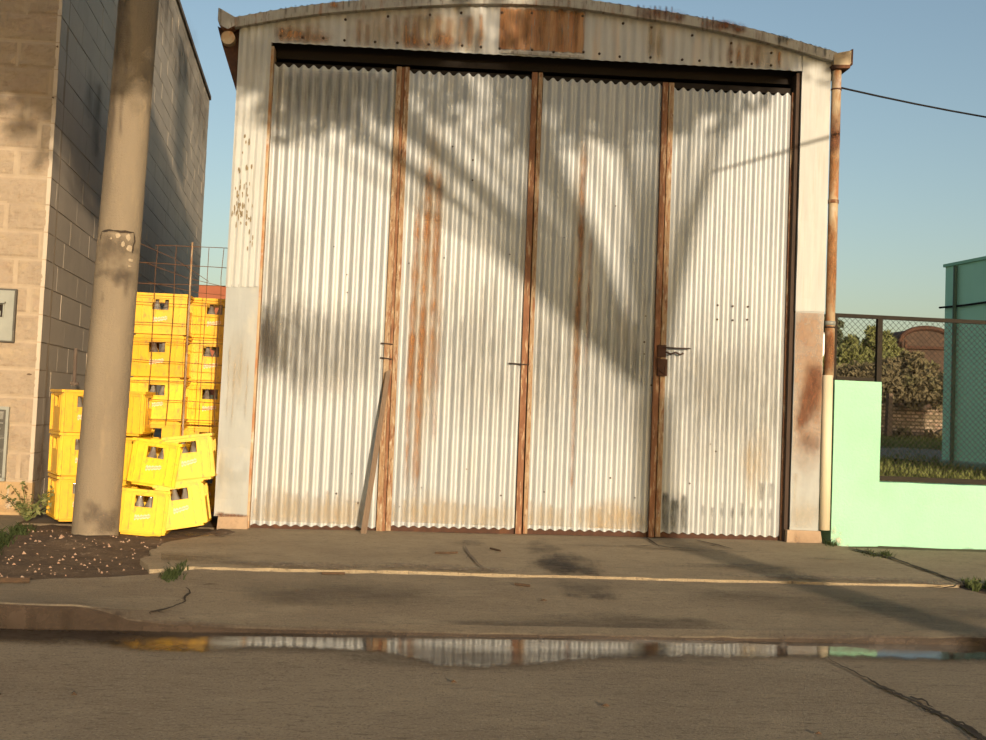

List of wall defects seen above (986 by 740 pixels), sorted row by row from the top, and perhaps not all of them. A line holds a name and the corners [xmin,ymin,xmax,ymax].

corrosion [499,0,584,53]
corrosion [650,7,683,47]
corrosion [702,18,744,33]
leakage [262,325,274,356]
corrosion [406,172,441,474]
corrosion [794,315,834,439]
crack [849,548,966,588]
crack [824,657,986,740]